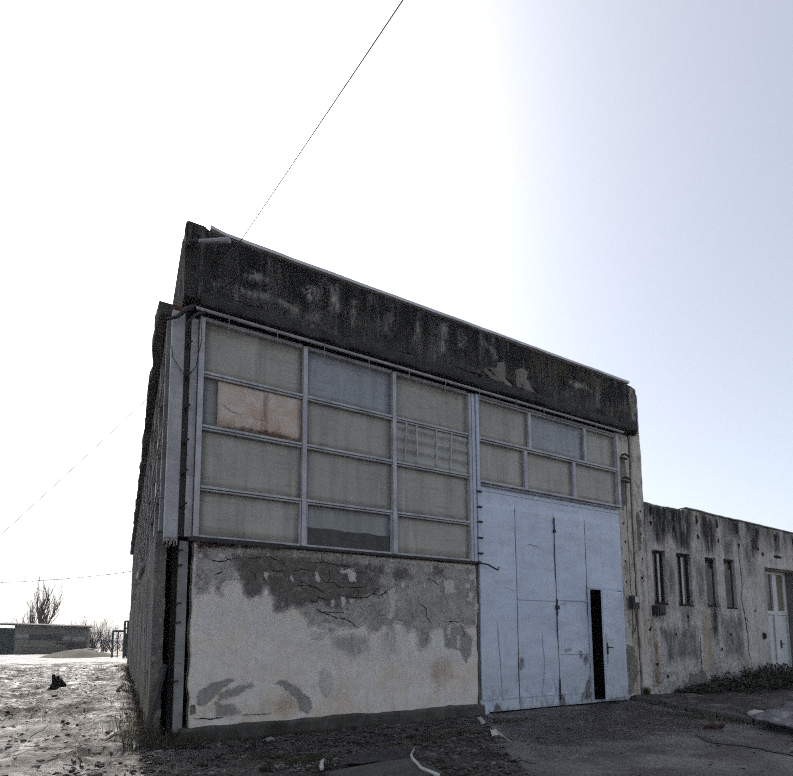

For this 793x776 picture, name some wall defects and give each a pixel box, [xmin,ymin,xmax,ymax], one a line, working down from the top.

spalling [472,362,539,394]
water stain [644,506,759,561]
crack [206,555,389,628]
peeling [193,542,479,663]
peeling [190,679,252,716]
peeling [276,680,312,713]